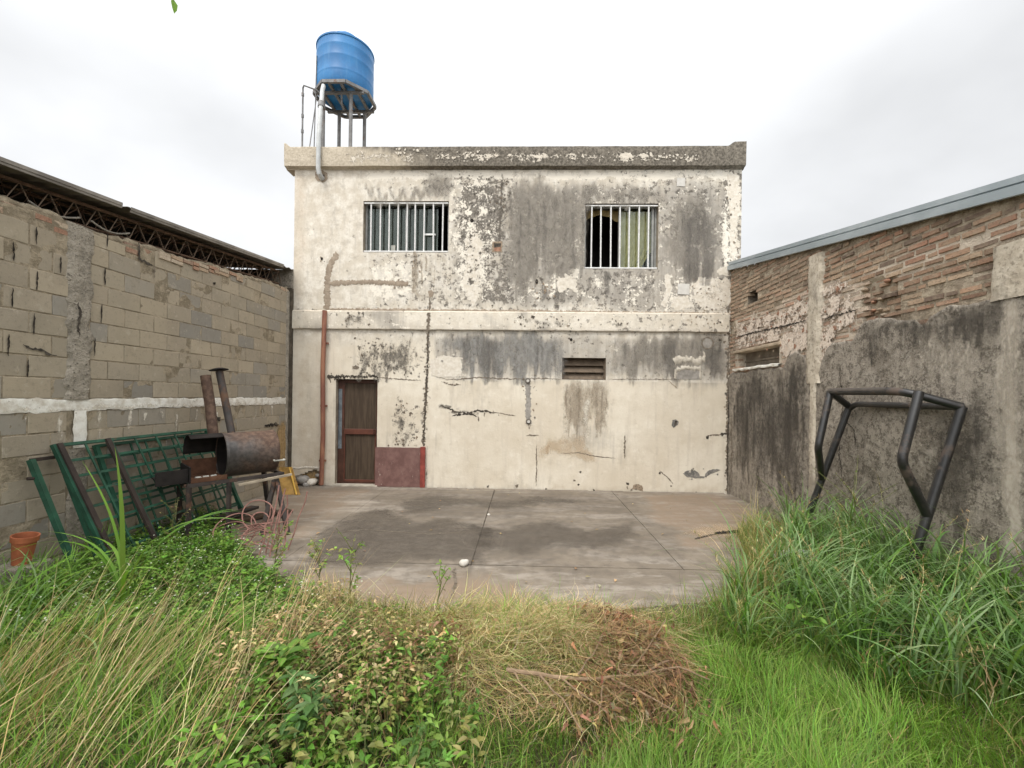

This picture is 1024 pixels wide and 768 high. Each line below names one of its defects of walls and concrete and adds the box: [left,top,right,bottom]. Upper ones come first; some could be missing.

peeling [360,148,499,159]
damp [495,174,596,301]
flaking render [661,170,808,367]
crack [23,344,57,356]
mould [354,337,412,383]
crack [327,290,560,446]
damp [453,321,562,385]
damp [622,332,721,382]
flaking render [819,279,886,361]
flaking render [683,468,720,480]
damp [733,370,805,500]
damp [891,298,1024,556]